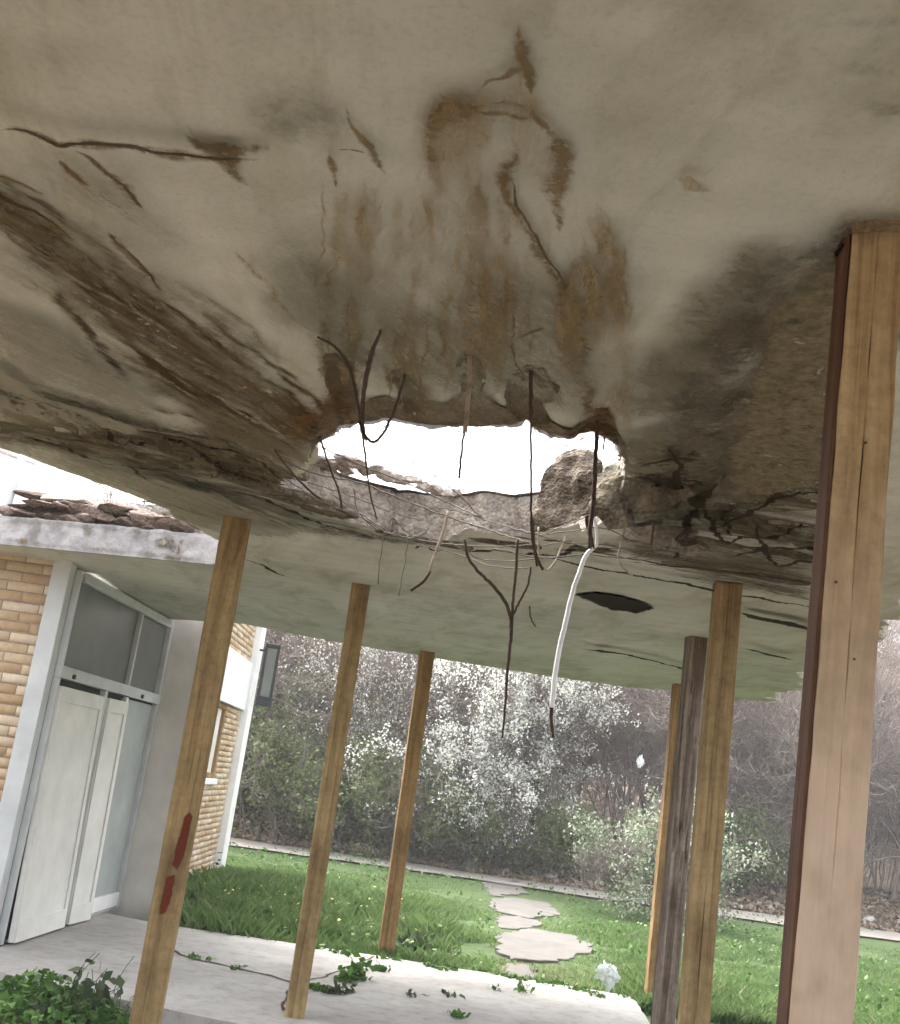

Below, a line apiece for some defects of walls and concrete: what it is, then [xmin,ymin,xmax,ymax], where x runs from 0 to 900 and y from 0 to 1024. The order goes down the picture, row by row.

crack [8,127,244,208]
crack [107,231,164,292]
damp [0,191,324,501]
damp [0,451,418,544]
rust [327,112,383,186]
spalling [108,328,633,738]
crack [2,395,818,630]
rust [332,149,624,457]
rust [425,30,574,231]
spalling [575,592,654,614]
damp [617,251,814,545]
spalling [670,244,844,561]